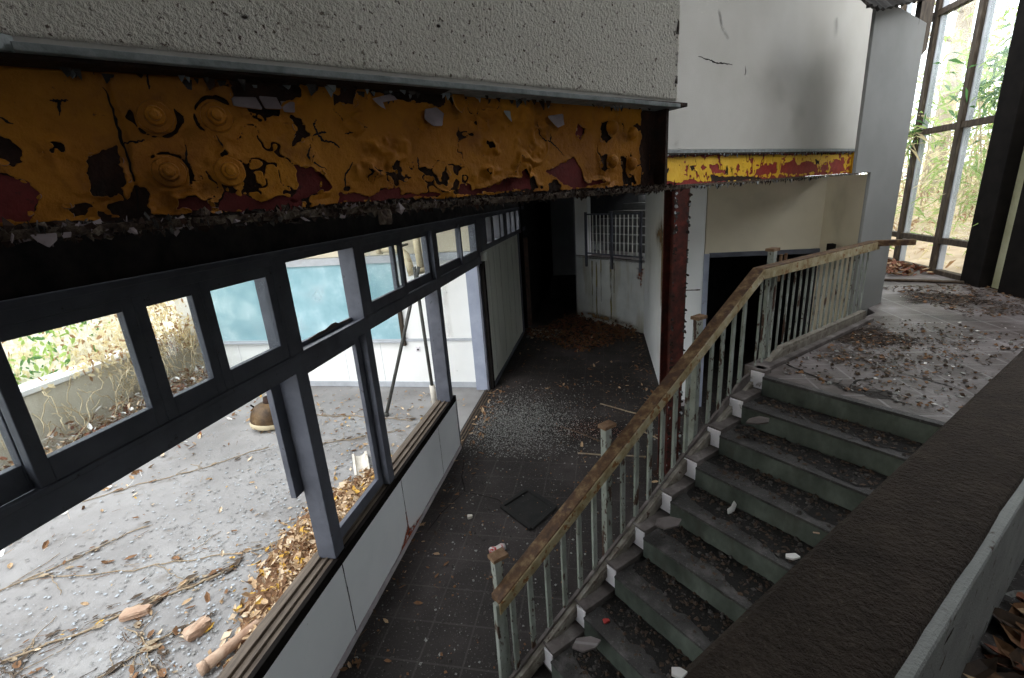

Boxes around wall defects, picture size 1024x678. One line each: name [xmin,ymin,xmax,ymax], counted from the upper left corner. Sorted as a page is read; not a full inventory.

crack [698,56,746,75]
peeling [228,81,310,146]
peeling [339,88,445,126]
peeling [0,136,42,224]
peeling [61,145,132,218]
peeling [291,162,531,203]
peeling [546,110,655,189]
peeling [687,158,846,182]
peeling [177,197,219,211]